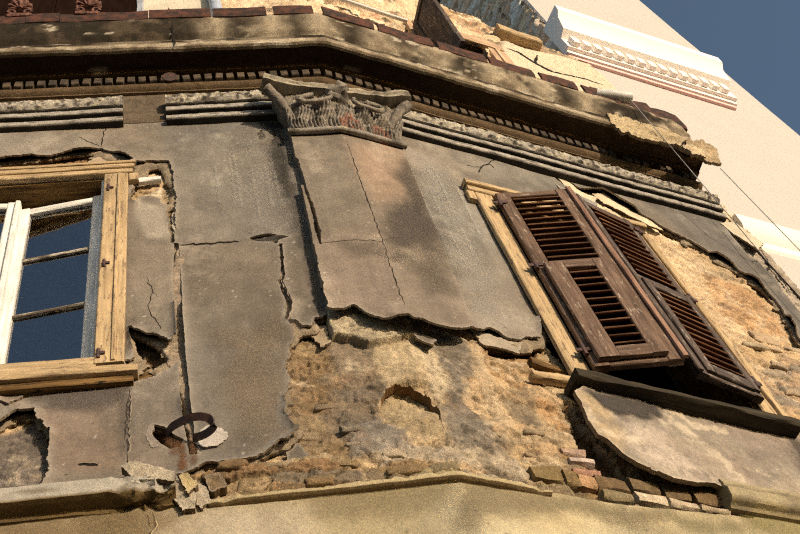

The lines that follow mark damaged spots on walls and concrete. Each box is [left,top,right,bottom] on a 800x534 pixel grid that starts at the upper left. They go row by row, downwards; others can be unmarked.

flaking render [28,157,106,166]
spalling [606,113,722,166]
crack [333,141,405,304]
crack [146,276,161,329]
crack [176,236,294,320]
flaking render [555,178,800,419]
flaking render [0,394,24,405]
flaking render [121,302,749,518]
flaking render [0,422,49,488]
crack [147,514,159,534]